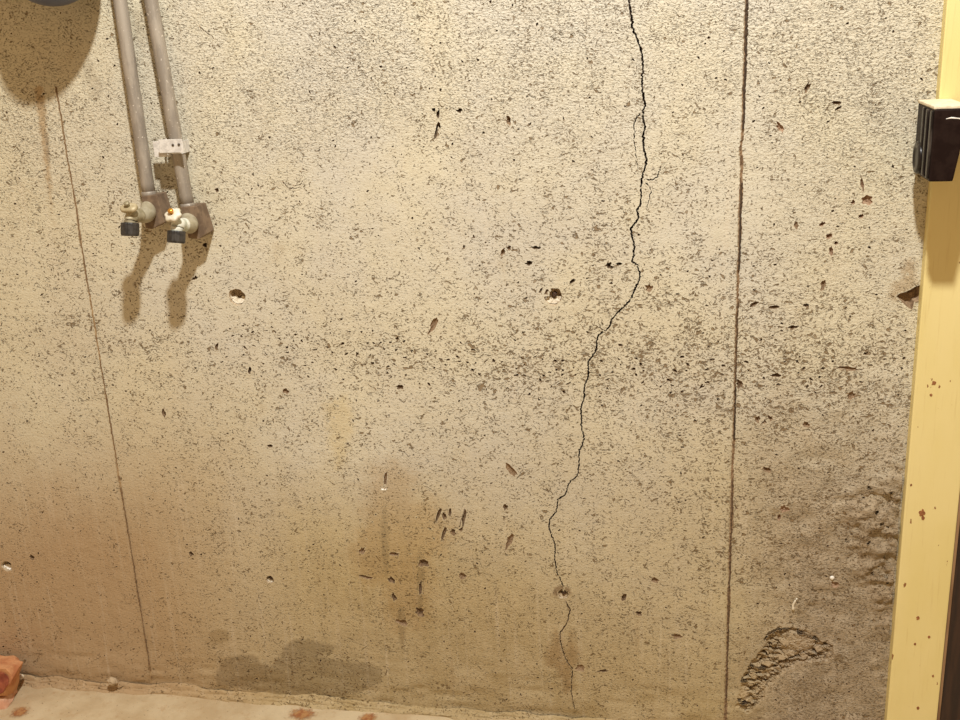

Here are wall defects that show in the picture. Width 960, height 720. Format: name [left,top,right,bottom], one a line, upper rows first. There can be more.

crack [547,0,664,712]
damp [203,625,389,700]
spalling [731,623,839,716]